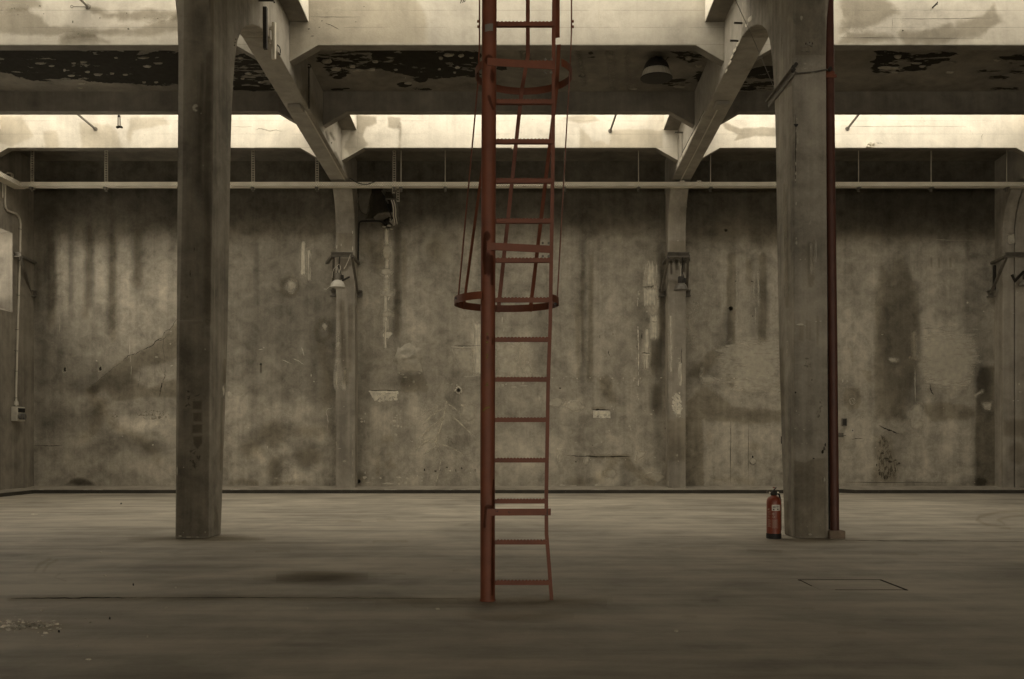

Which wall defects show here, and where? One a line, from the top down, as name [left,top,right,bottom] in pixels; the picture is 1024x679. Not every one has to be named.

peeling [0,50,178,89]
peeling [315,50,482,91]
peeling [870,50,957,74]